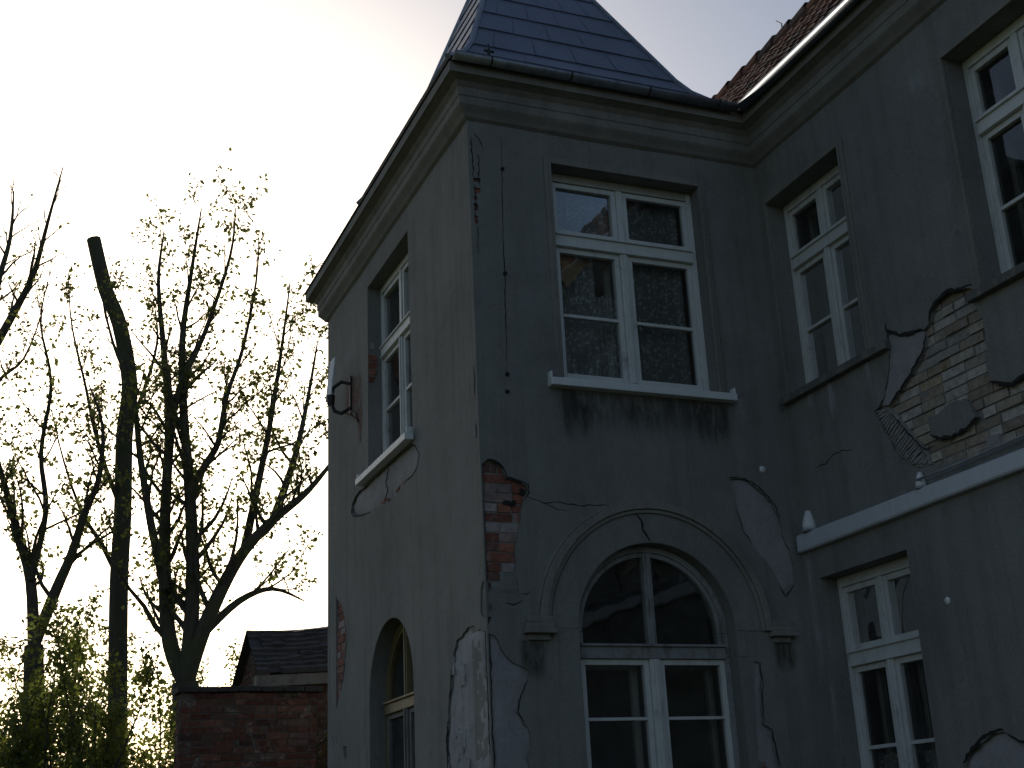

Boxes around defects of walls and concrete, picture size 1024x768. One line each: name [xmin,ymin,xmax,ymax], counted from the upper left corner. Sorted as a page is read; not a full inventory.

crack [470,133,507,363]
spalling [876,284,1024,468]
spalling [351,444,419,517]
spalling [727,477,794,597]
spalling [337,602,347,700]
spalling [445,458,530,768]
spalling [963,728,1024,768]